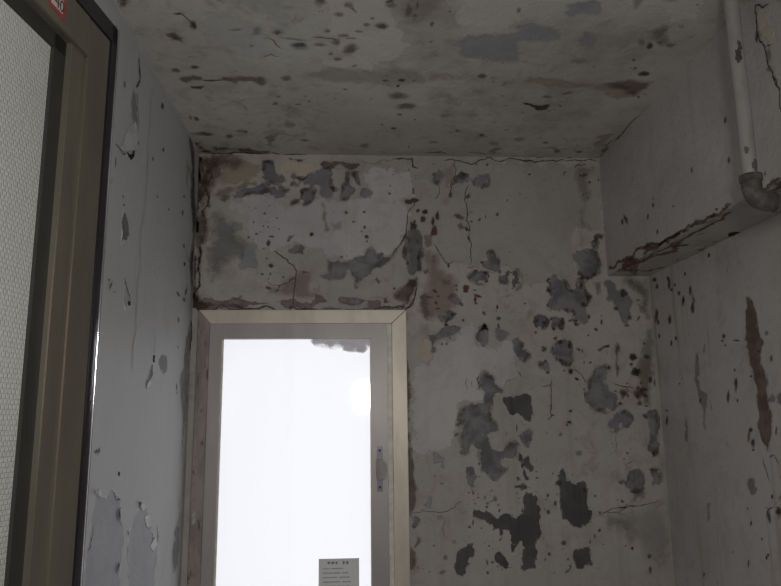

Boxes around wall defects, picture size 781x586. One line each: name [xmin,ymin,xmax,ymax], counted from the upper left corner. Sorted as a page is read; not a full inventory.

crack [755,3,781,110]
damp [177,139,304,310]
peeling [222,159,372,206]
peeling [321,250,391,290]
crack [363,152,596,268]
peeling [533,234,603,374]
corrosion [608,204,730,276]
peeling [454,371,535,495]
peeling [582,362,660,457]
corrosion [745,297,772,451]
peeling [453,541,477,577]
peeling [468,466,594,574]